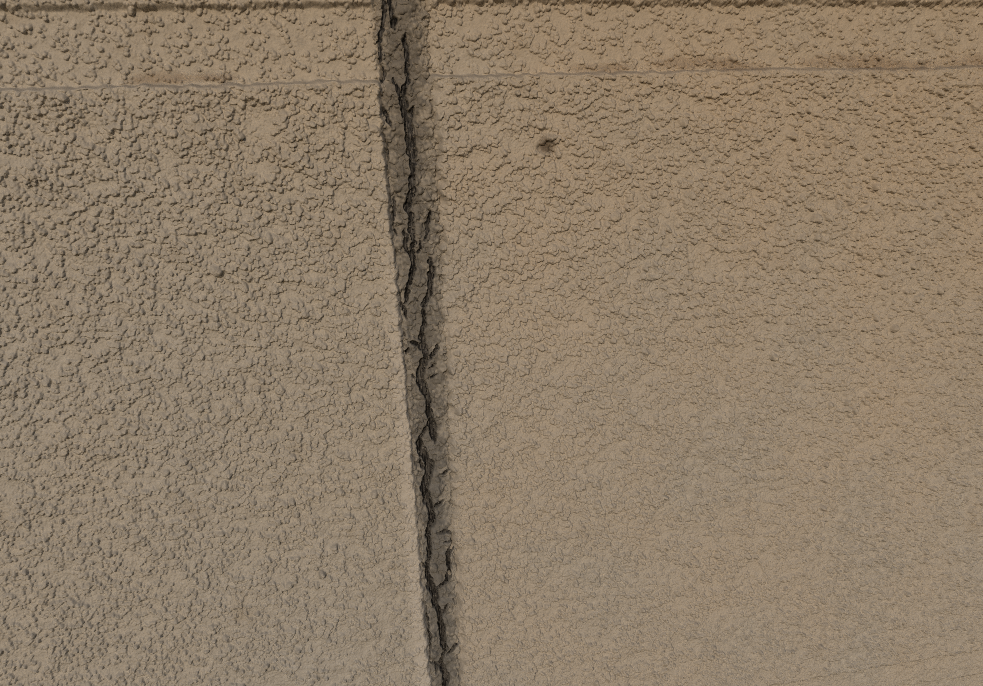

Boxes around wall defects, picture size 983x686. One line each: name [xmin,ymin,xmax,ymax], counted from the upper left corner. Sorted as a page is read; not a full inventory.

crack [376,0,458,686]